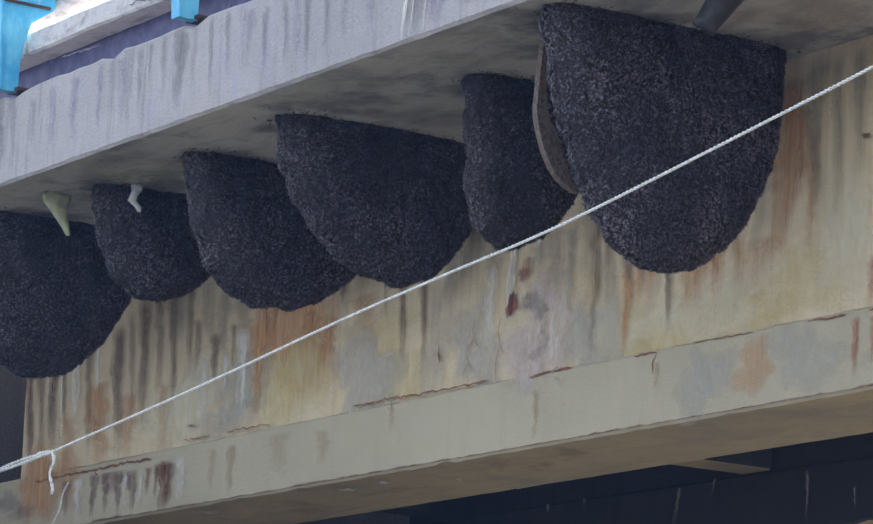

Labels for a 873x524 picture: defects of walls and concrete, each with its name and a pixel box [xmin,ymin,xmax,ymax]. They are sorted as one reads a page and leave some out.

rust [775,86,804,214]
rust [251,302,332,392]
crack [353,318,504,410]
crack [635,352,657,373]
rust [20,449,50,516]
crack [36,458,151,483]
rust [93,384,873,522]